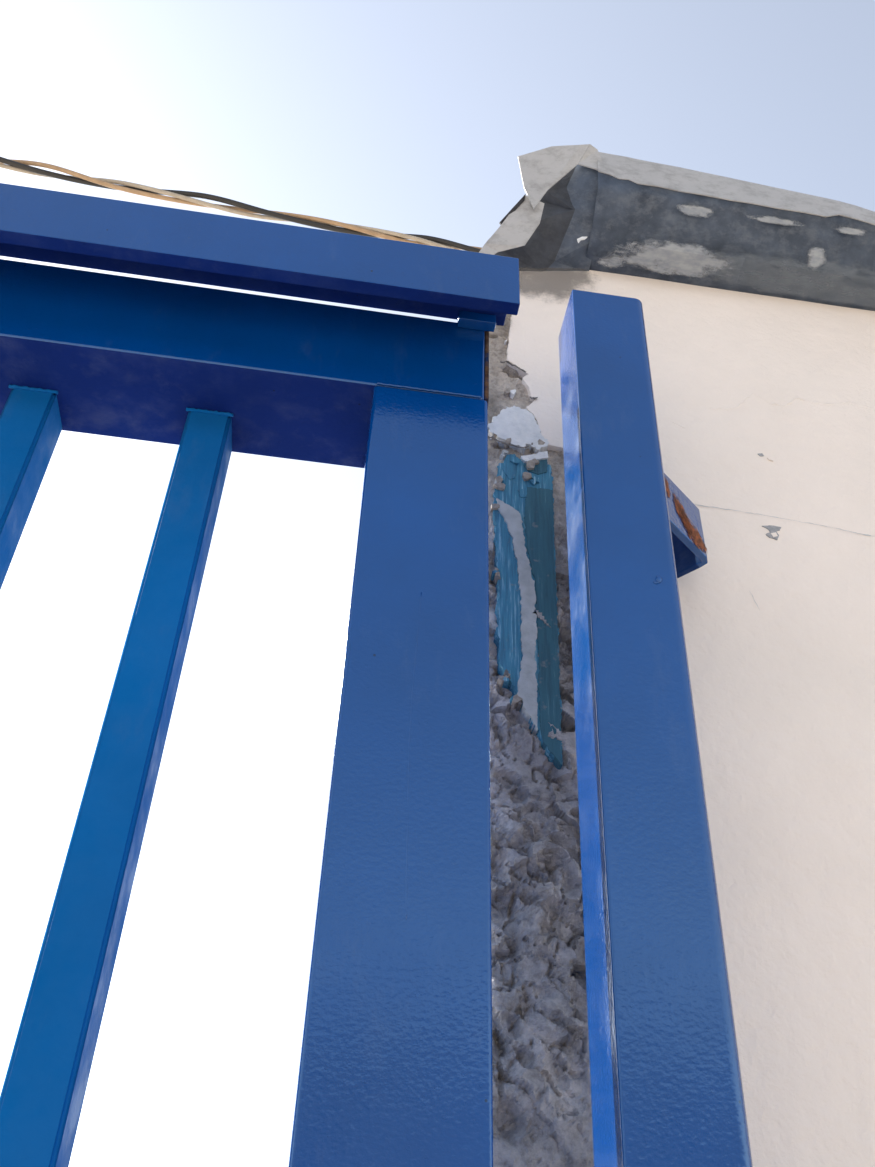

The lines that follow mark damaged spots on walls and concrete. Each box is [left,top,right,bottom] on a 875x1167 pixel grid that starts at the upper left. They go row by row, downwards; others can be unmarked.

spalling [487,314,594,1167]
rust [664,477,707,552]